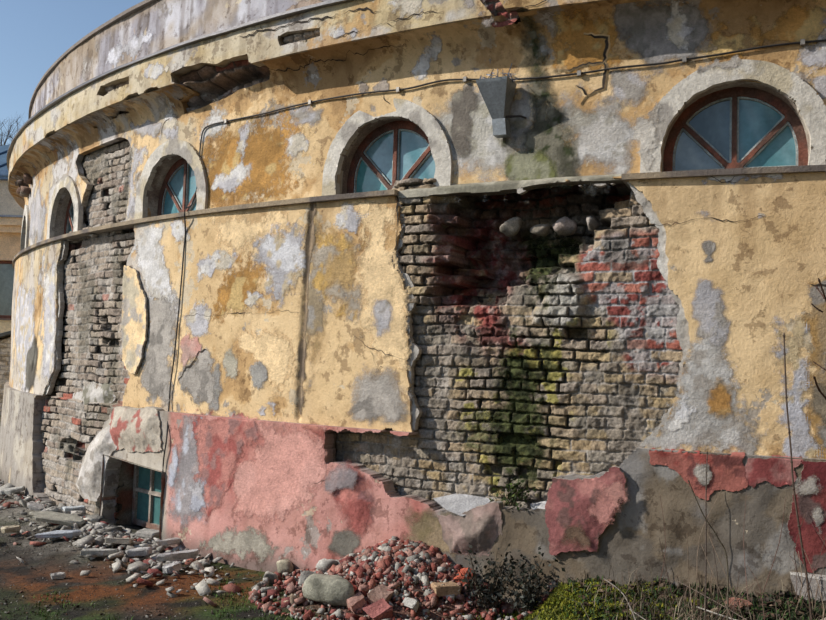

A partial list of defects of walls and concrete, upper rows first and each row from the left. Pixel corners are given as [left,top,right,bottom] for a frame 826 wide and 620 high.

peeling [105,30,152,68]
spalling [179,59,271,142]
crack [240,0,439,72]
spalling [463,0,519,28]
leakage [433,17,646,186]
crack [560,32,611,105]
peeling [211,121,255,194]
crack [651,215,765,232]
peeling [244,223,306,307]
spalling [15,139,261,521]
flaking render [249,361,267,389]
spalling [335,178,826,573]